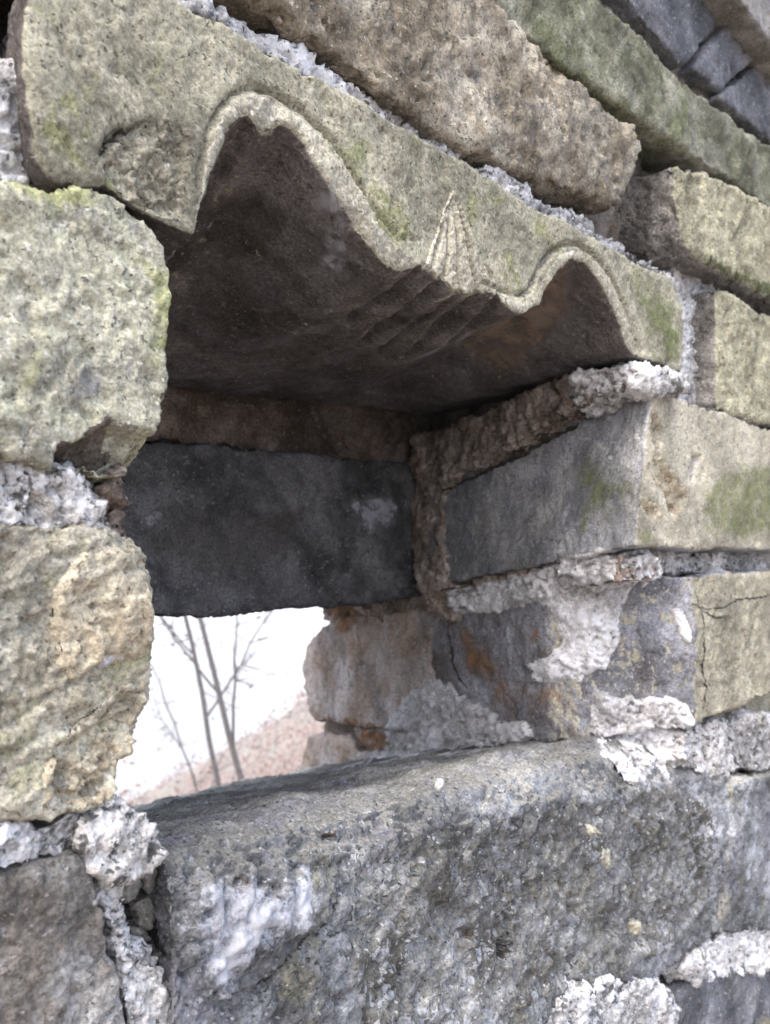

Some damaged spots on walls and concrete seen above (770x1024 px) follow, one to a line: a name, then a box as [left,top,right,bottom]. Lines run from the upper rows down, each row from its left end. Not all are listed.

crack [692,593,768,709]